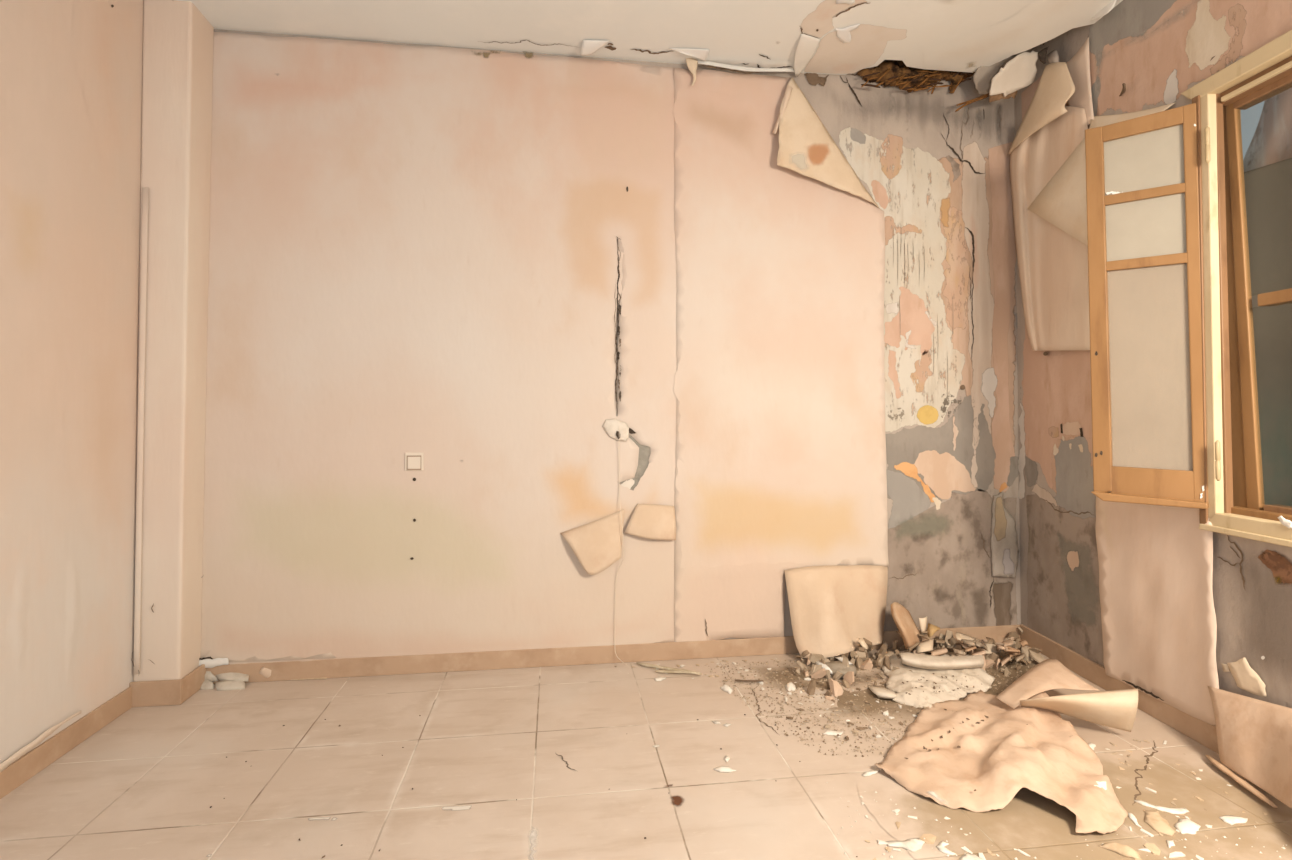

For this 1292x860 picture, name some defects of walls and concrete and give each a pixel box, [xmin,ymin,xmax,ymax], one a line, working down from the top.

crack [478,40,791,74]
crack [800,2,869,39]
peeling [794,0,990,112]
peeling [1021,47,1059,120]
water stain [542,162,676,318]
crack [613,236,621,415]
peeling [839,127,1093,494]
water stain [202,187,1104,667]
peeling [894,450,976,510]
peeling [1067,551,1079,571]
crack [1132,741,1158,805]